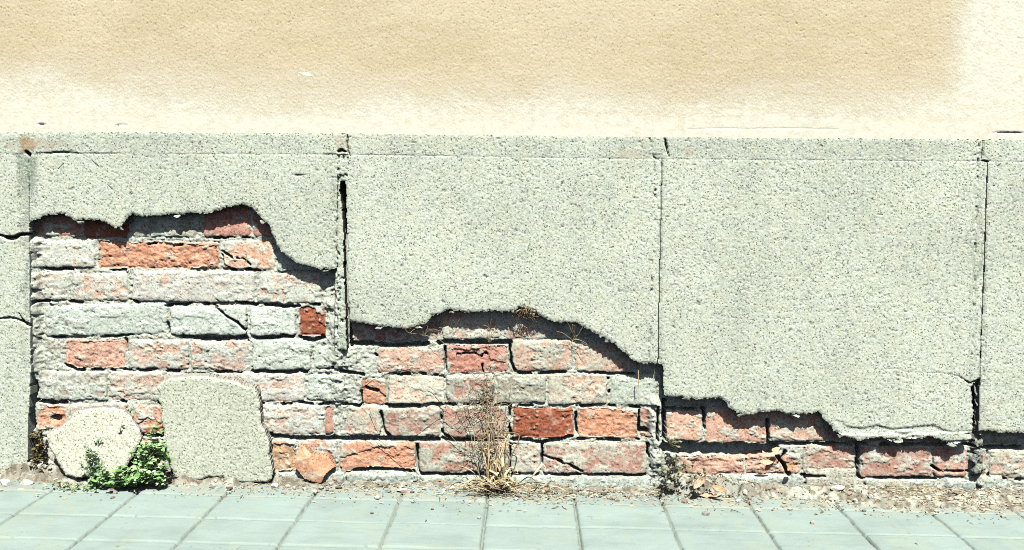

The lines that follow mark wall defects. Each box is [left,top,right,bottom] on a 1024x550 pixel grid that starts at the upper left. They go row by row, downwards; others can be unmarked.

spalling [99,214,218,269]
spalling [300,307,327,336]
spalling [67,341,126,369]
spalling [448,348,506,374]
spalling [363,386,387,405]
spalling [39,405,67,430]
spalling [138,417,164,434]
spalling [513,407,637,438]
spalling [686,450,801,477]